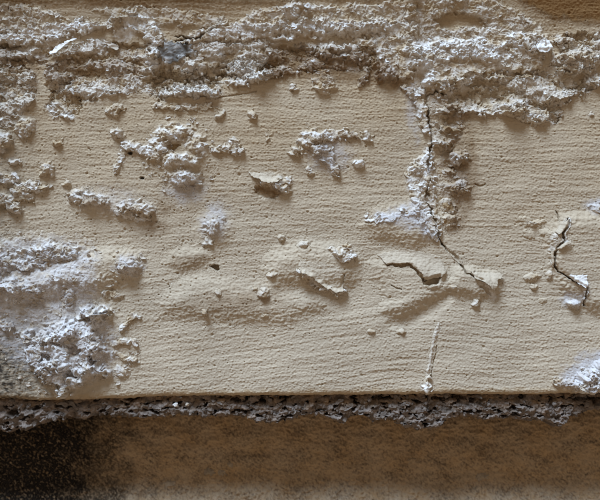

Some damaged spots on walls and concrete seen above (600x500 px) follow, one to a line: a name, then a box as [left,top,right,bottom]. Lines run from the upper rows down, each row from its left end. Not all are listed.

spalling [0,38,371,127]
peeling [249,171,283,183]
crack [423,87,484,282]
spalling [424,30,600,239]
efflorescence [0,229,149,400]
peeling [299,259,344,293]
crack [548,210,590,306]
water stain [0,415,108,500]
spalling [0,393,600,433]
efflorescence [552,352,600,395]